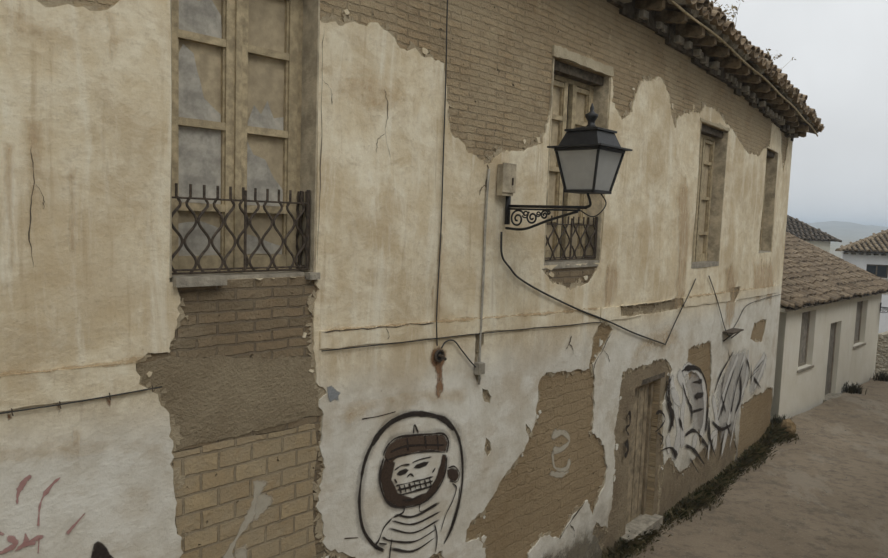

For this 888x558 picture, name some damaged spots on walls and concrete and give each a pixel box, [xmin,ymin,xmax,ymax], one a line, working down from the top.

spalling [36,0,120,11]
spalling [320,0,788,165]
crack [28,150,45,260]
spalling [542,266,597,290]
spalling [135,277,355,558]
rust [431,347,445,397]
spalling [465,319,772,558]